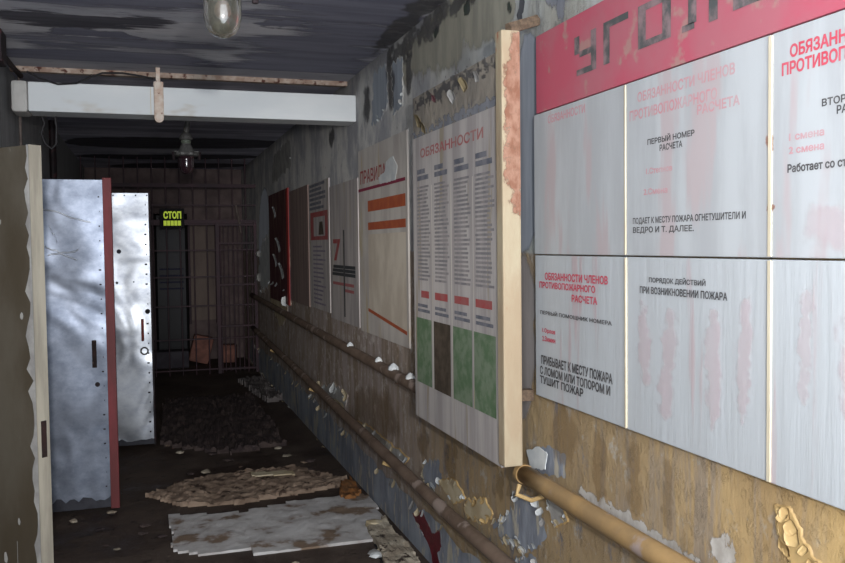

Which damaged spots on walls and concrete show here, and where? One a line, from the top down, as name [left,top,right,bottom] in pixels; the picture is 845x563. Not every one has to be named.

peeling [250,340,481,563]
peeling [420,458,569,563]
peeling [526,445,566,478]
peeling [774,503,823,563]